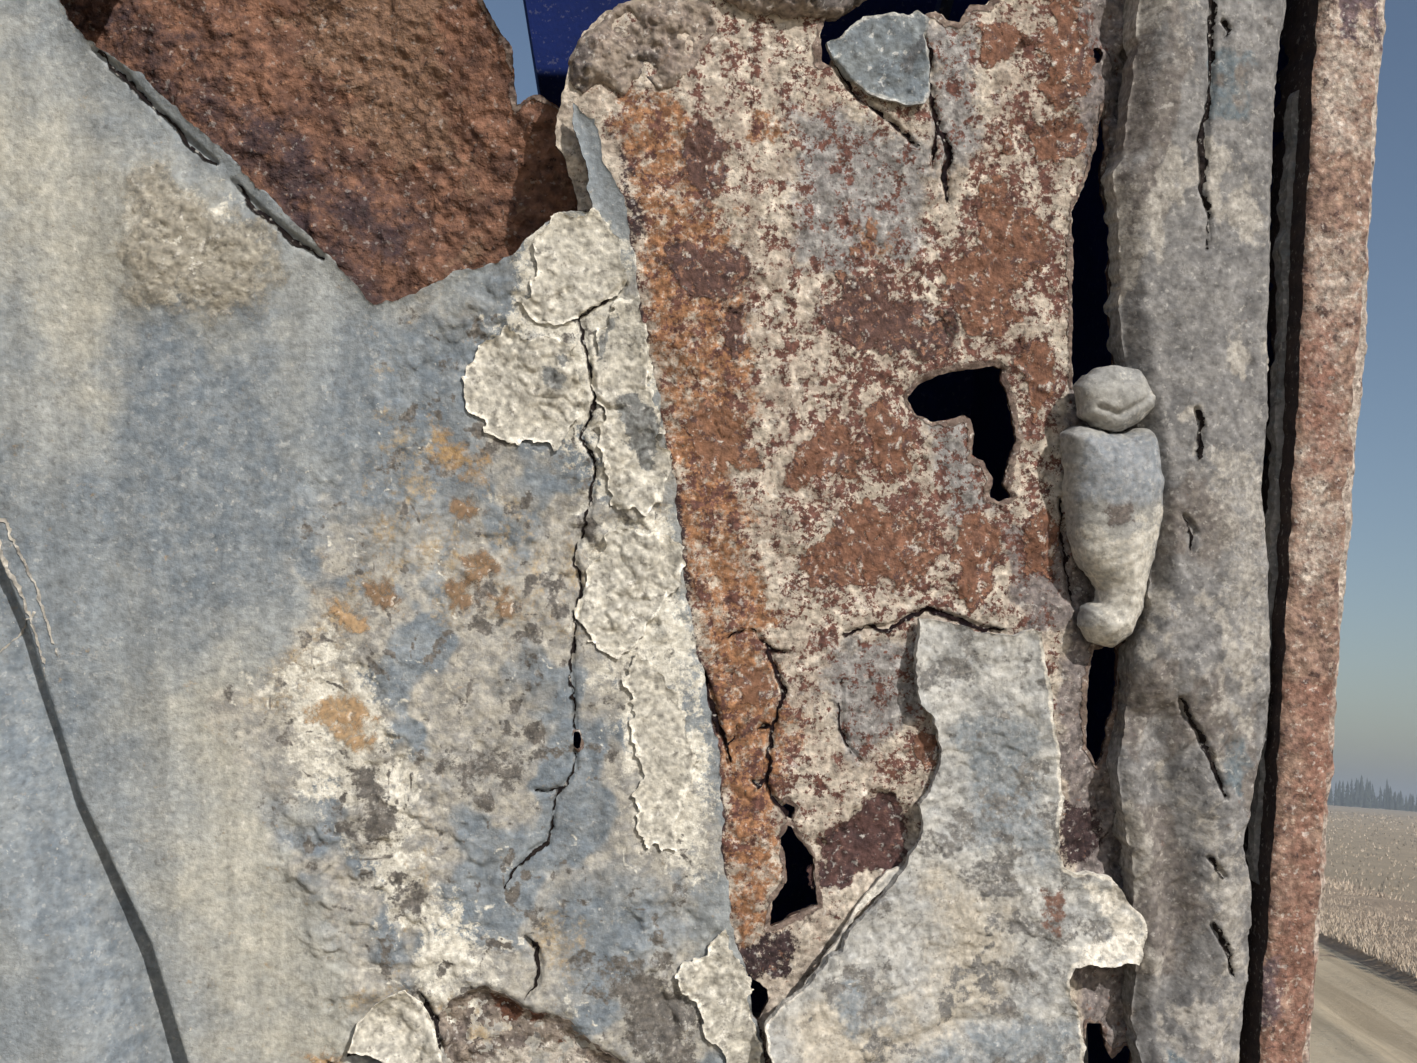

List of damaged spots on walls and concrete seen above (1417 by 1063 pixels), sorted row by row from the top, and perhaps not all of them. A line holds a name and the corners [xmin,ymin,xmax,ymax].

crack [94,50,325,260]
peeling [825,10,930,107]
corrosion [975,0,1096,166]
crack [1197,0,1232,249]
corrosion [815,171,1057,424]
crack [504,284,626,889]
peeling [461,208,699,851]
crack [704,628,789,817]
corrosion [774,400,1003,613]
crack [843,606,1004,637]
corrosion [1239,0,1386,1063]
spalling [802,792,909,988]